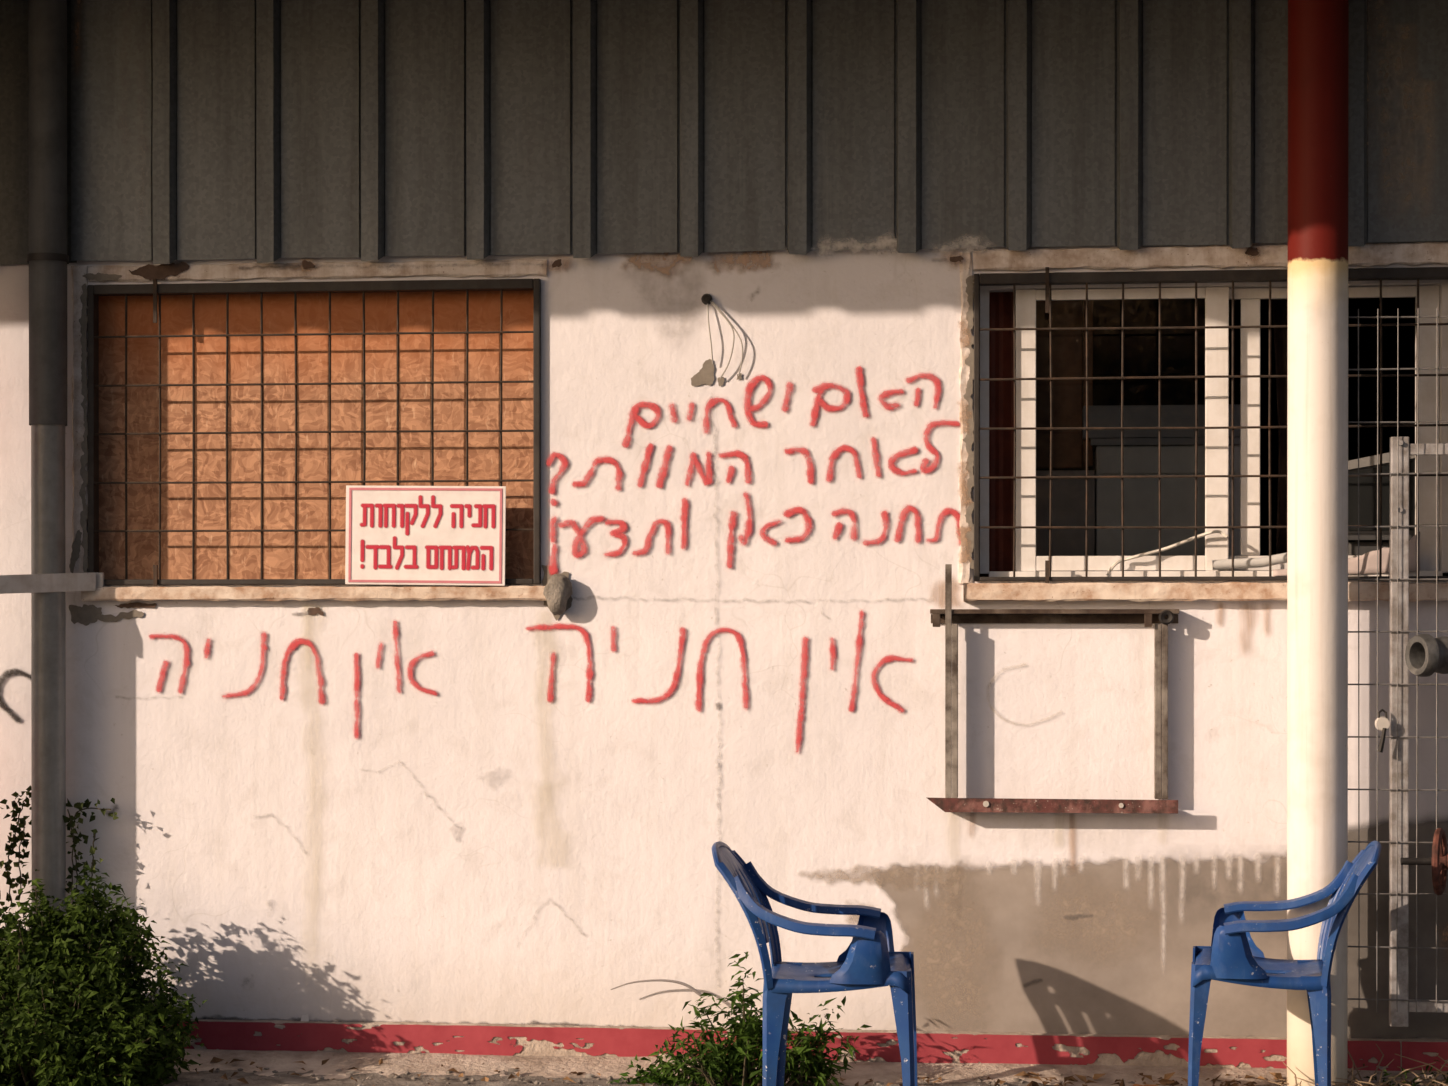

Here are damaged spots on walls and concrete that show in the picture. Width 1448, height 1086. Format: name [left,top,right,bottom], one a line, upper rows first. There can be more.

peeling [69,262,189,573]
flaking render [69,602,157,626]